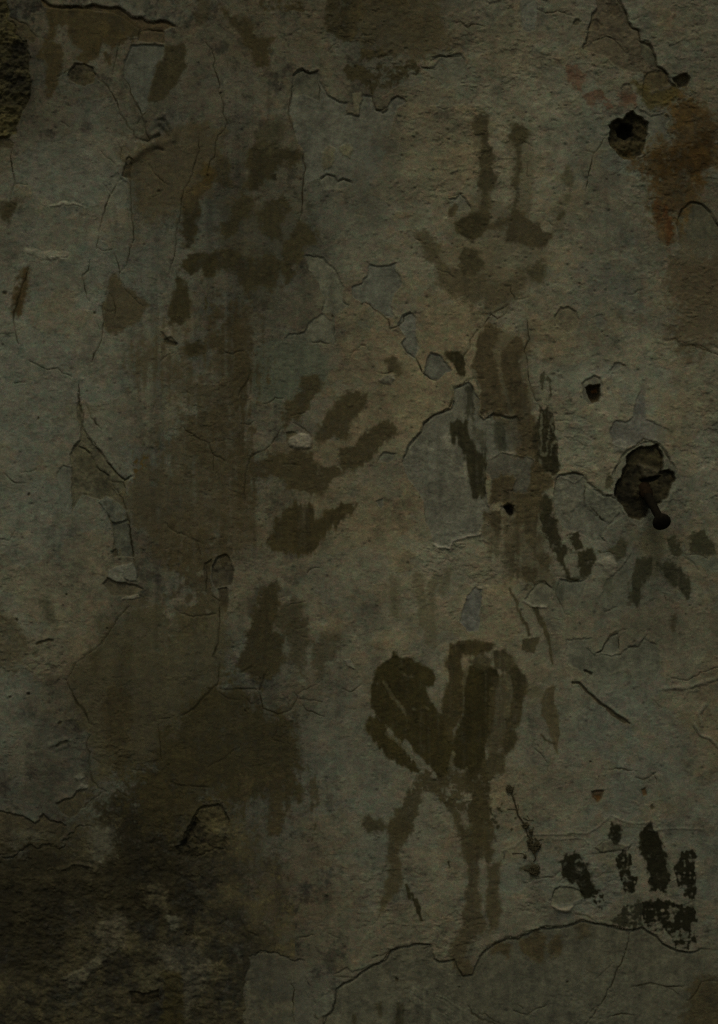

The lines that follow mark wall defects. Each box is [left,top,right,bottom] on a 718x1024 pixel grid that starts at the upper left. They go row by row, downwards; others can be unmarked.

crack [419,55,460,70]
crack [537,0,671,80]
corrosion [622,80,718,248]
crack [678,200,718,227]
flaking render [69,398,144,601]
leakage [57,116,345,865]
flaking render [553,379,679,542]
crack [322,914,718,1024]